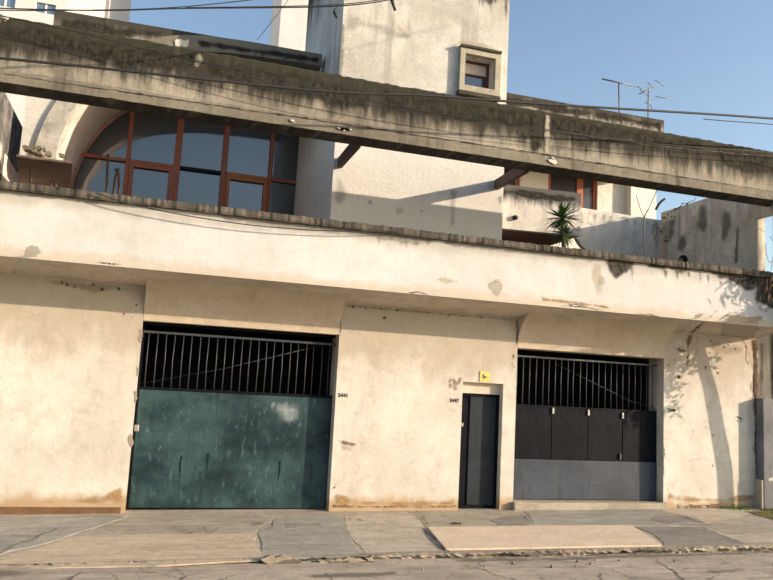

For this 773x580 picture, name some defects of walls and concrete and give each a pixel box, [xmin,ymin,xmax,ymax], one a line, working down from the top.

damp [0,20,185,72]
damp [211,63,368,114]
damp [383,90,704,158]
damp [718,147,773,176]
damp [607,260,633,278]
damp [712,271,773,308]
corrosion [677,314,711,365]
damp [85,489,121,503]
crack [451,548,608,560]
crack [631,547,663,555]